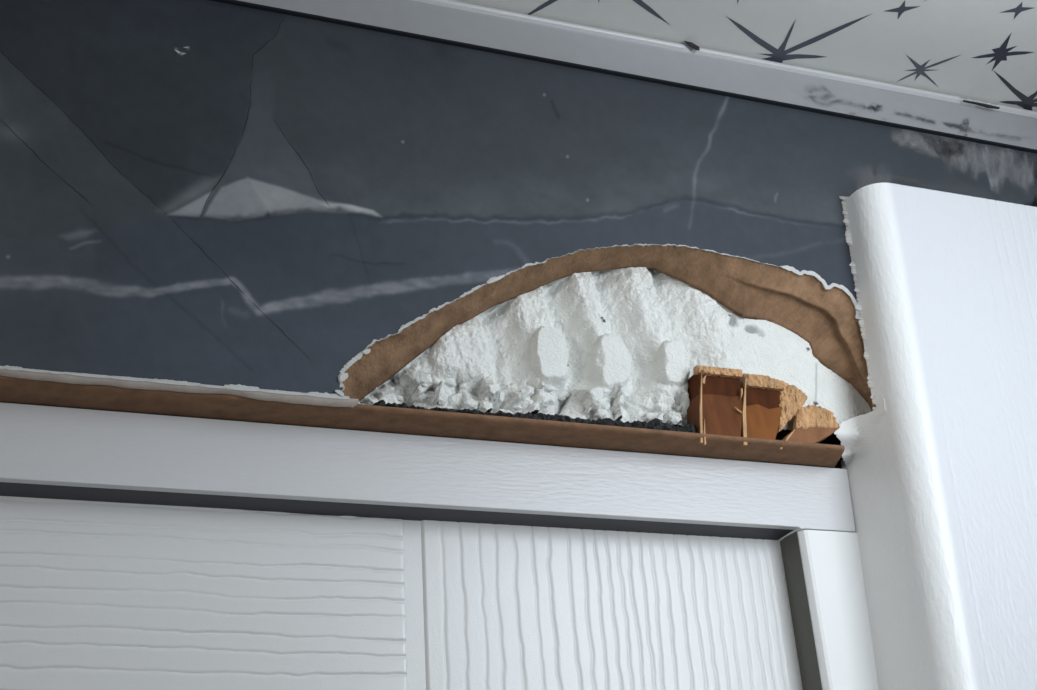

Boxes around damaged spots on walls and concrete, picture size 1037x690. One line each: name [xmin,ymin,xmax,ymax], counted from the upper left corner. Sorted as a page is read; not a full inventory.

flaking render [335,196,887,466]